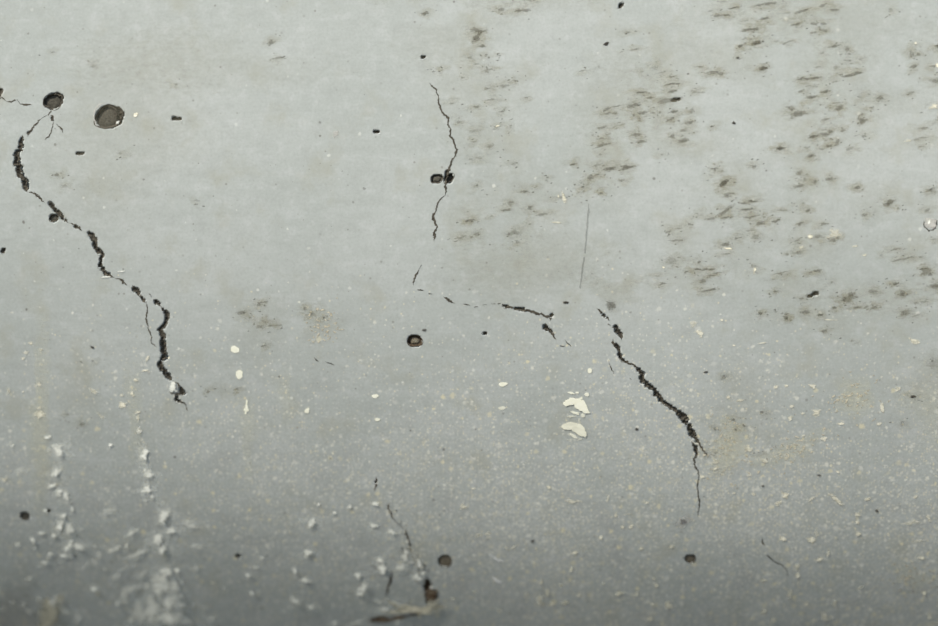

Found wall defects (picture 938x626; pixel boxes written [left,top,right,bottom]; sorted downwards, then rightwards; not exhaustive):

crack [430,84,458,239]
crack [0,88,188,411]
crack [413,266,572,347]
crack [598,309,707,512]
crack [371,565,393,596]
crack [374,477,430,581]